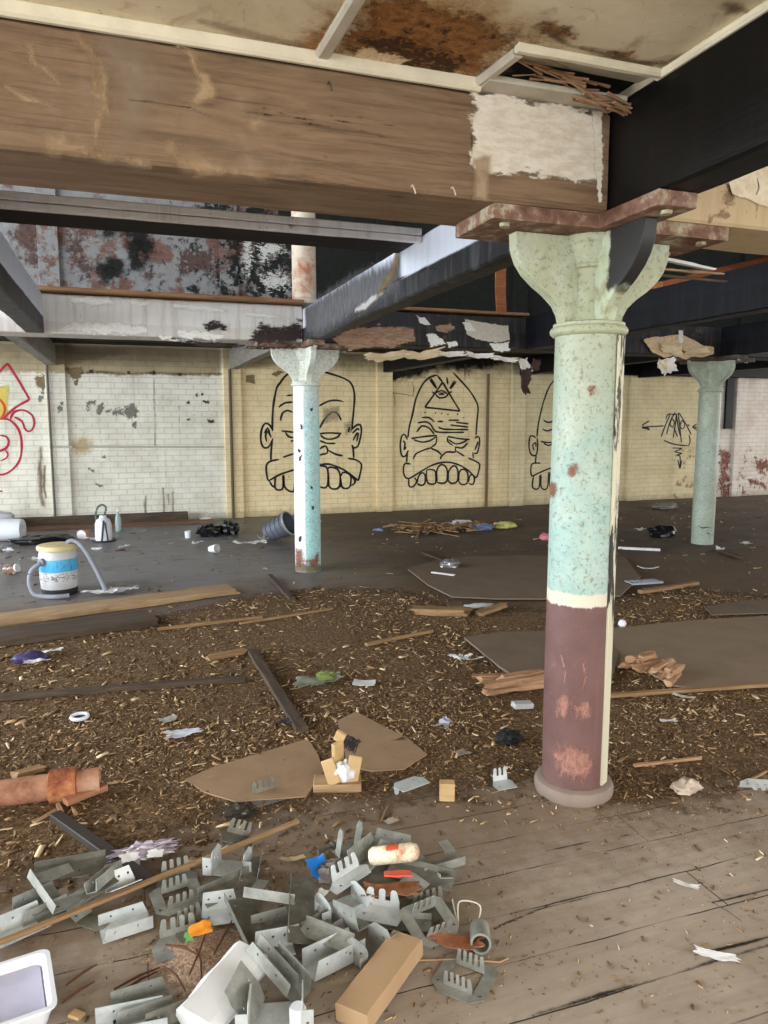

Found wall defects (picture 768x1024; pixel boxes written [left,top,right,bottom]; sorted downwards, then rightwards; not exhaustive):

peeling [468,92,604,203]
peeling [728,166,768,207]
peeling [238,241,292,293]
peeling [68,295,152,307]
peeling [59,321,224,343]
peeling [364,315,541,395]
peeling [644,330,714,376]
peeling [86,400,138,428]
spalling [717,449,768,497]
rust [295,548,321,573]
rust [555,656,591,719]
rust [554,743,592,781]